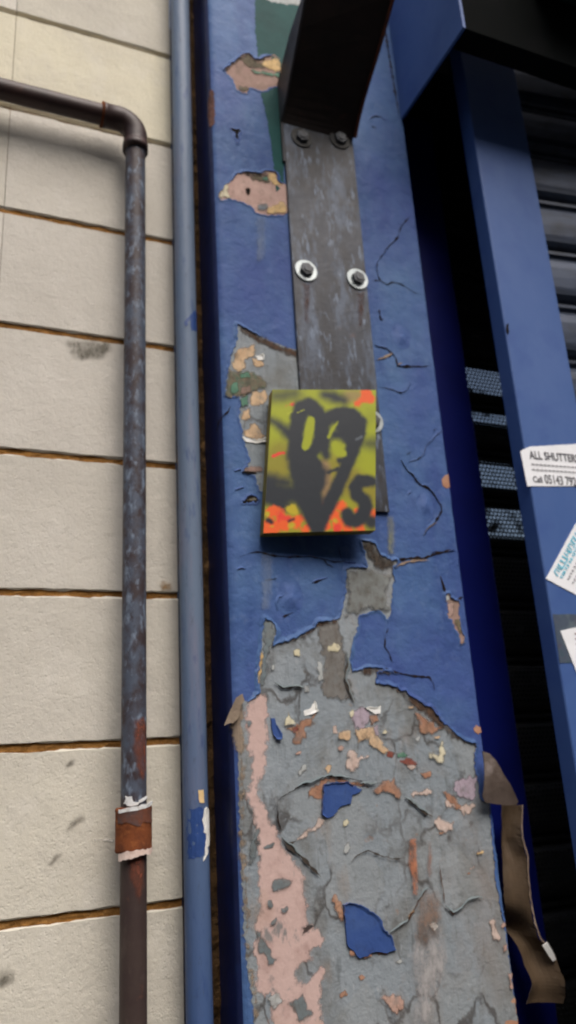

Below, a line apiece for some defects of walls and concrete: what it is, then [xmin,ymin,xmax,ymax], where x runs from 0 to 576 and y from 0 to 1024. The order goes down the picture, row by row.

peeling [222,51,281,95]
peeling [216,168,288,218]
crack [372,215,431,394]
peeling [223,320,299,506]
crack [391,428,462,601]
rust [134,718,146,777]
crack [273,774,377,877]
crack [352,850,401,861]
peeling [224,538,565,1024]
crack [405,797,433,817]
crack [390,866,482,933]